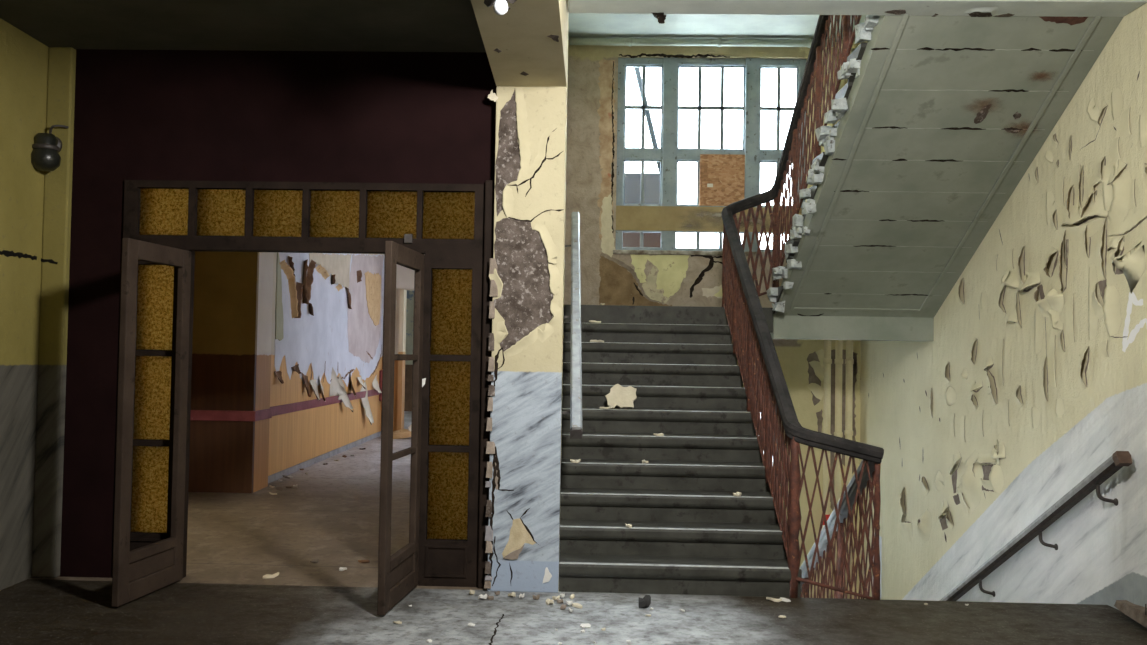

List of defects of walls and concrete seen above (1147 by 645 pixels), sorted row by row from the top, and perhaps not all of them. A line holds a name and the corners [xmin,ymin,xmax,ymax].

spalling [837,58,861,80]
spalling [855,10,906,44]
crack [503,124,564,222]
spalling [597,53,730,306]
crack [690,255,722,298]
spalling [767,98,848,312]
peeling [979,99,1147,402]
peeling [274,252,385,425]
spalling [484,71,562,589]
flaking render [600,384,637,409]
peeling [899,438,1006,544]
crack [489,614,504,645]